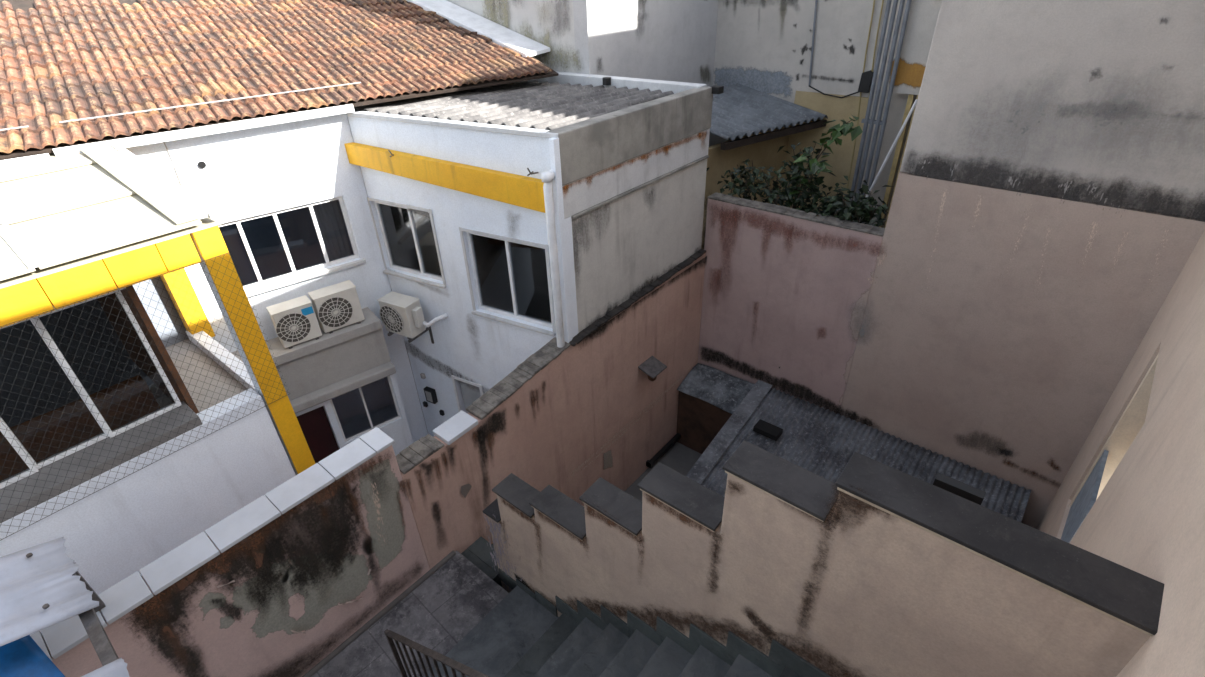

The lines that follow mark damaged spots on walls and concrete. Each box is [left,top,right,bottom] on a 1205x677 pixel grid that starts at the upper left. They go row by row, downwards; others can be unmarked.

rust [562,132,707,192]
water stain [583,198,800,342]
water stain [905,157,1205,296]
water stain [472,382,546,496]
peeling [198,459,405,638]
water stain [503,499,587,544]
water stain [483,513,861,677]
water stain [646,494,720,592]
water stain [801,489,890,570]